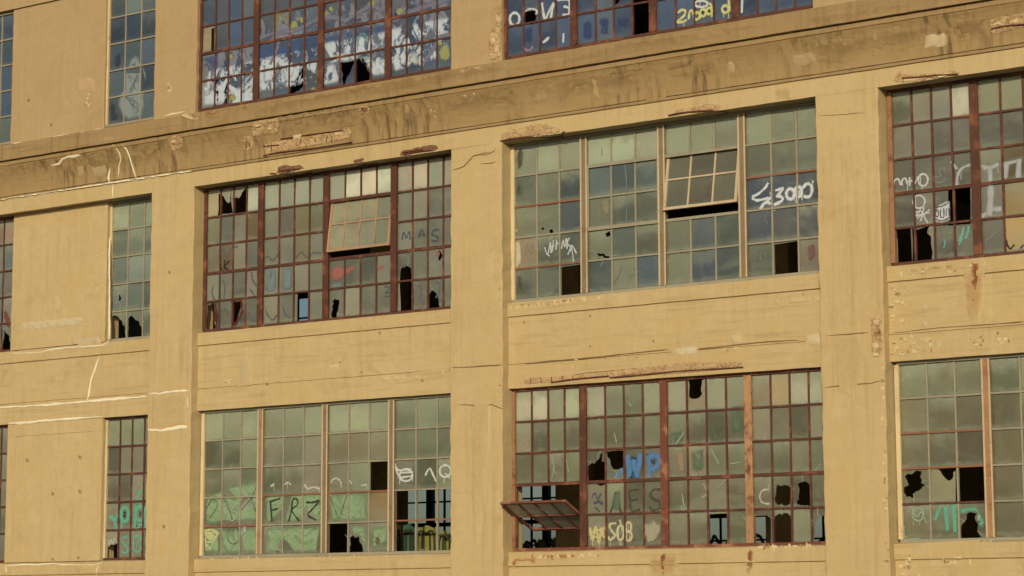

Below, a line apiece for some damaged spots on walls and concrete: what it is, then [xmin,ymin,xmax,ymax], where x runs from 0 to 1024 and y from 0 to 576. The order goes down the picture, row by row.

leakage [816,25,925,64]
leakage [253,28,733,133]
leakage [775,86,794,100]
crack [1,129,192,200]
spalling [243,118,352,176]
crack [454,150,496,170]
spalling [500,124,565,141]
rust [963,262,985,324]
crack [0,238,188,432]